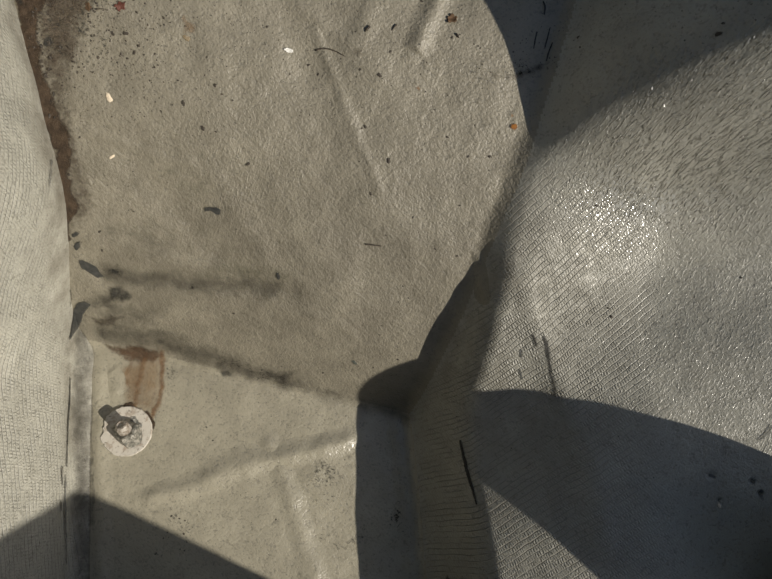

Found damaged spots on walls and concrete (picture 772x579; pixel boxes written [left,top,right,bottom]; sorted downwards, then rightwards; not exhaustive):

leakage [103,288,130,302]
rust [109,346,164,431]